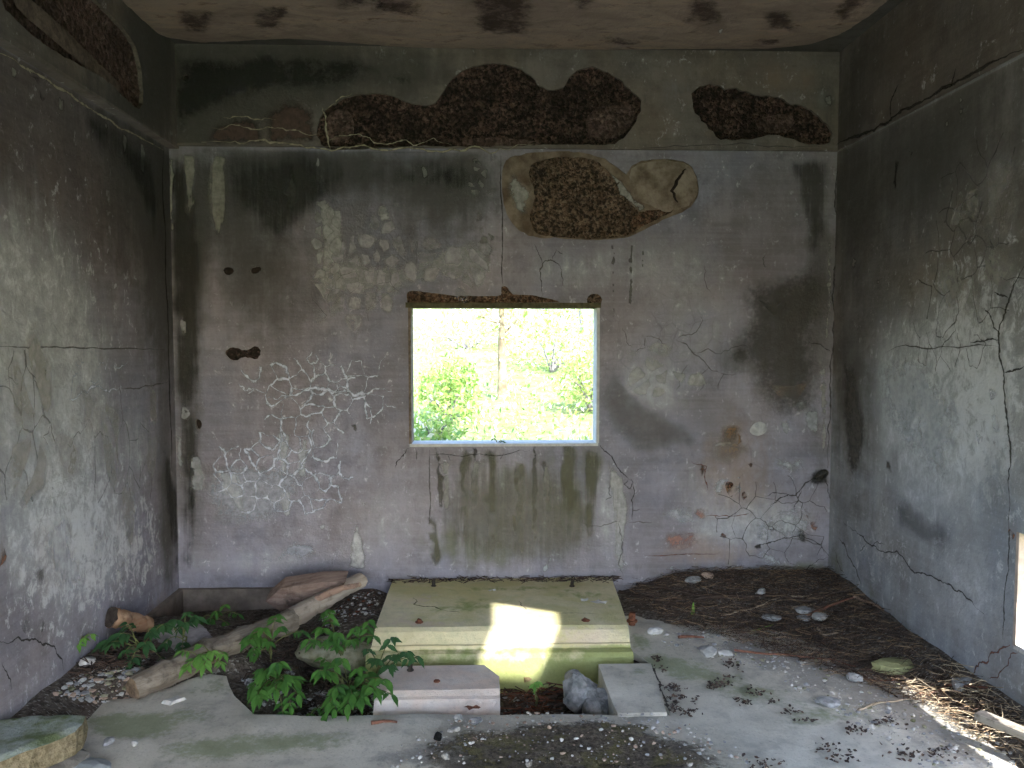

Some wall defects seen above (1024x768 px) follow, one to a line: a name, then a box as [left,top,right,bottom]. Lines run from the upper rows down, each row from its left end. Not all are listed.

spalling [2,0,143,109]
spalling [209,63,699,240]
spalling [692,84,832,145]
crack [0,150,172,513]
damp [166,155,393,544]
peeling [311,201,559,330]
spalling [587,294,602,303]
damp [736,277,827,449]
crack [692,133,1024,678]
damp [430,520,440,563]
damp [436,446,598,571]
crack [583,446,699,573]